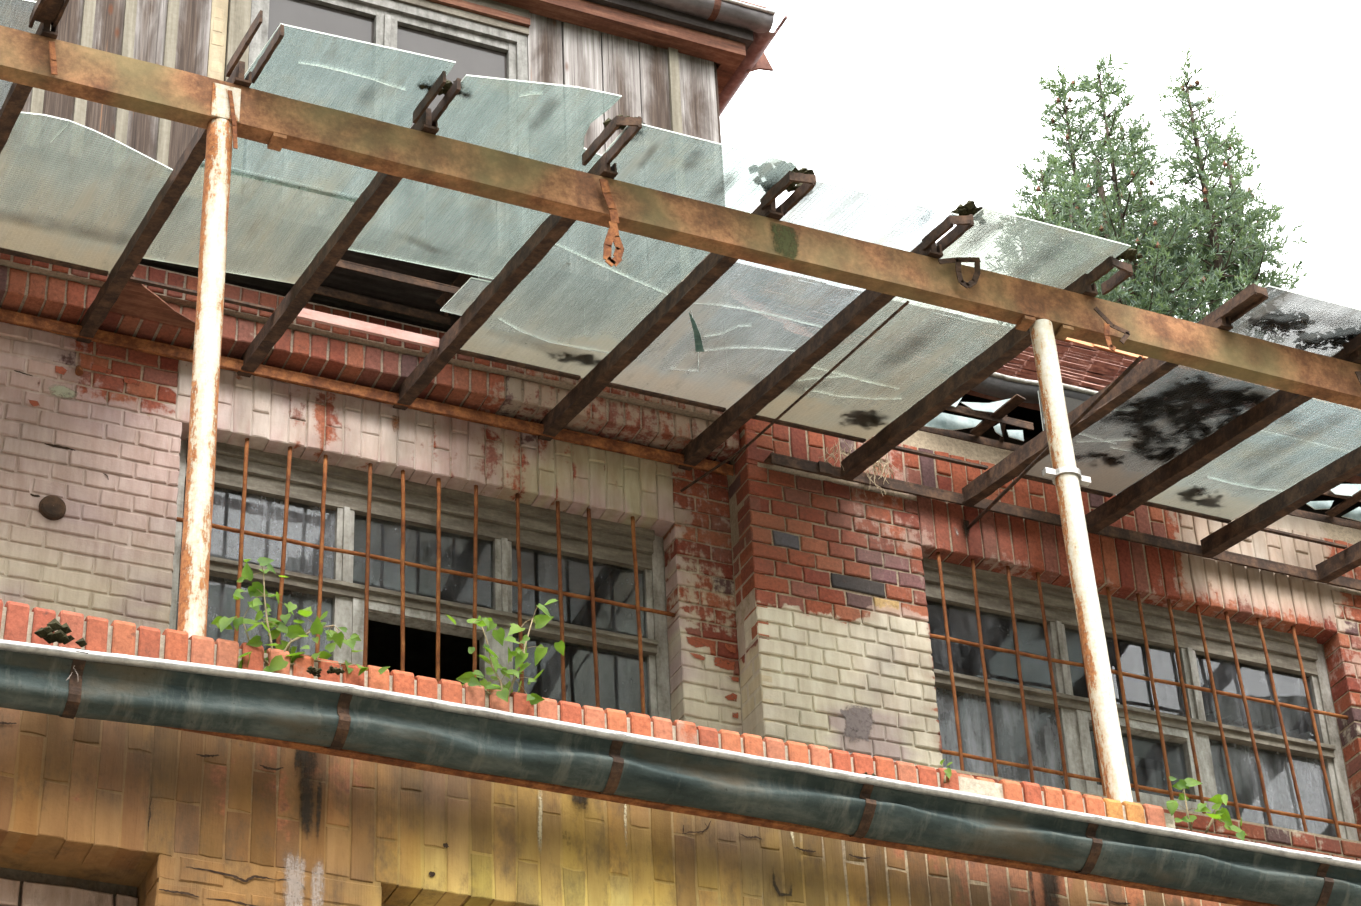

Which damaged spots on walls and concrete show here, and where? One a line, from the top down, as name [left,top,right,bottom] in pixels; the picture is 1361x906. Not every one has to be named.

peeling [686,637,739,718]
damp [294,749,322,837]